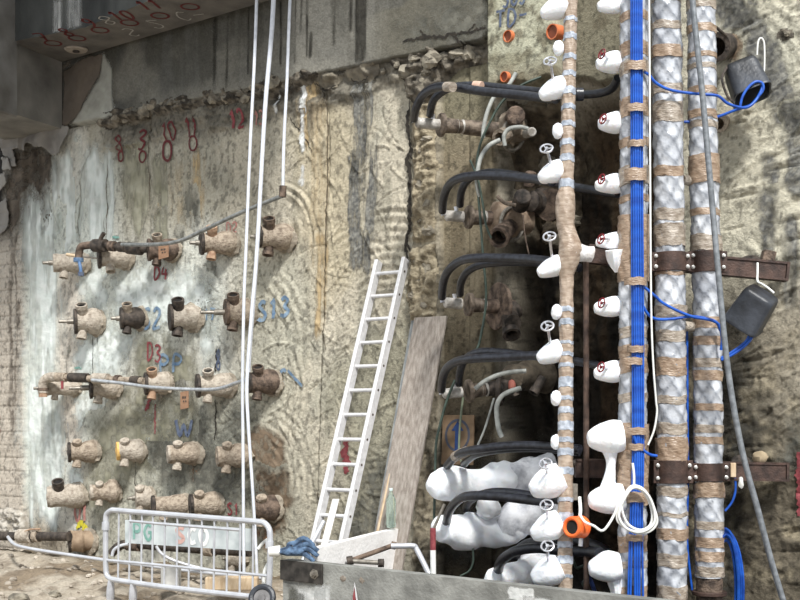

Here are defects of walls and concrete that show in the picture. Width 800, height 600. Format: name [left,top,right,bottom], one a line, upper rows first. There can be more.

peeling [6,148,52,242]
spalling [97,69,319,130]
crack [290,70,368,352]
leakage [347,80,377,274]
crack [404,98,413,262]
crack [403,24,486,46]
leakage [23,143,292,531]